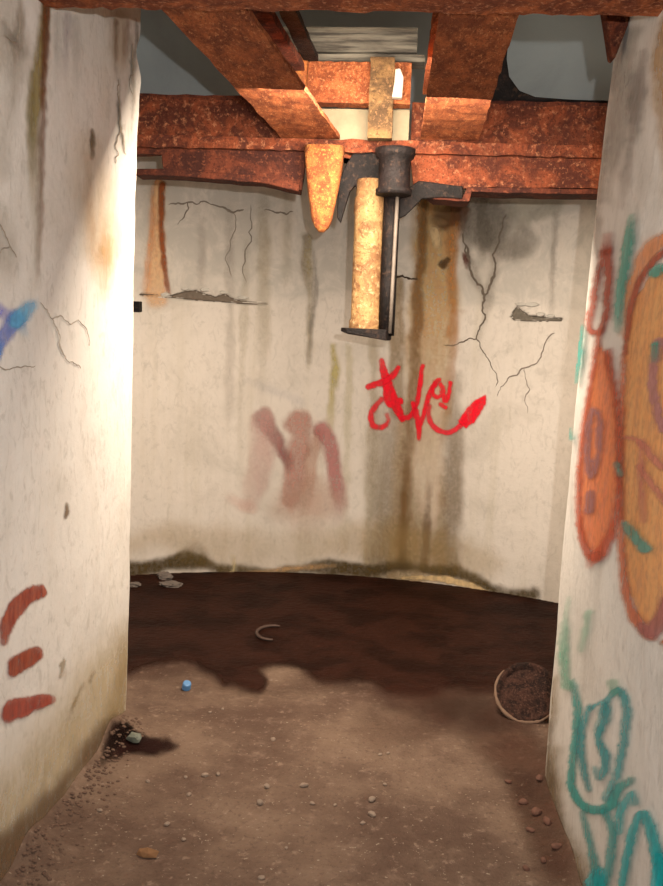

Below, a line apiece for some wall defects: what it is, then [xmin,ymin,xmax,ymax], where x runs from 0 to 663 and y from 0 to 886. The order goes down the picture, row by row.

corrosion [148,180,169,300]
crack [169,201,293,282]
corrosion [411,199,470,374]
crack [445,214,554,413]